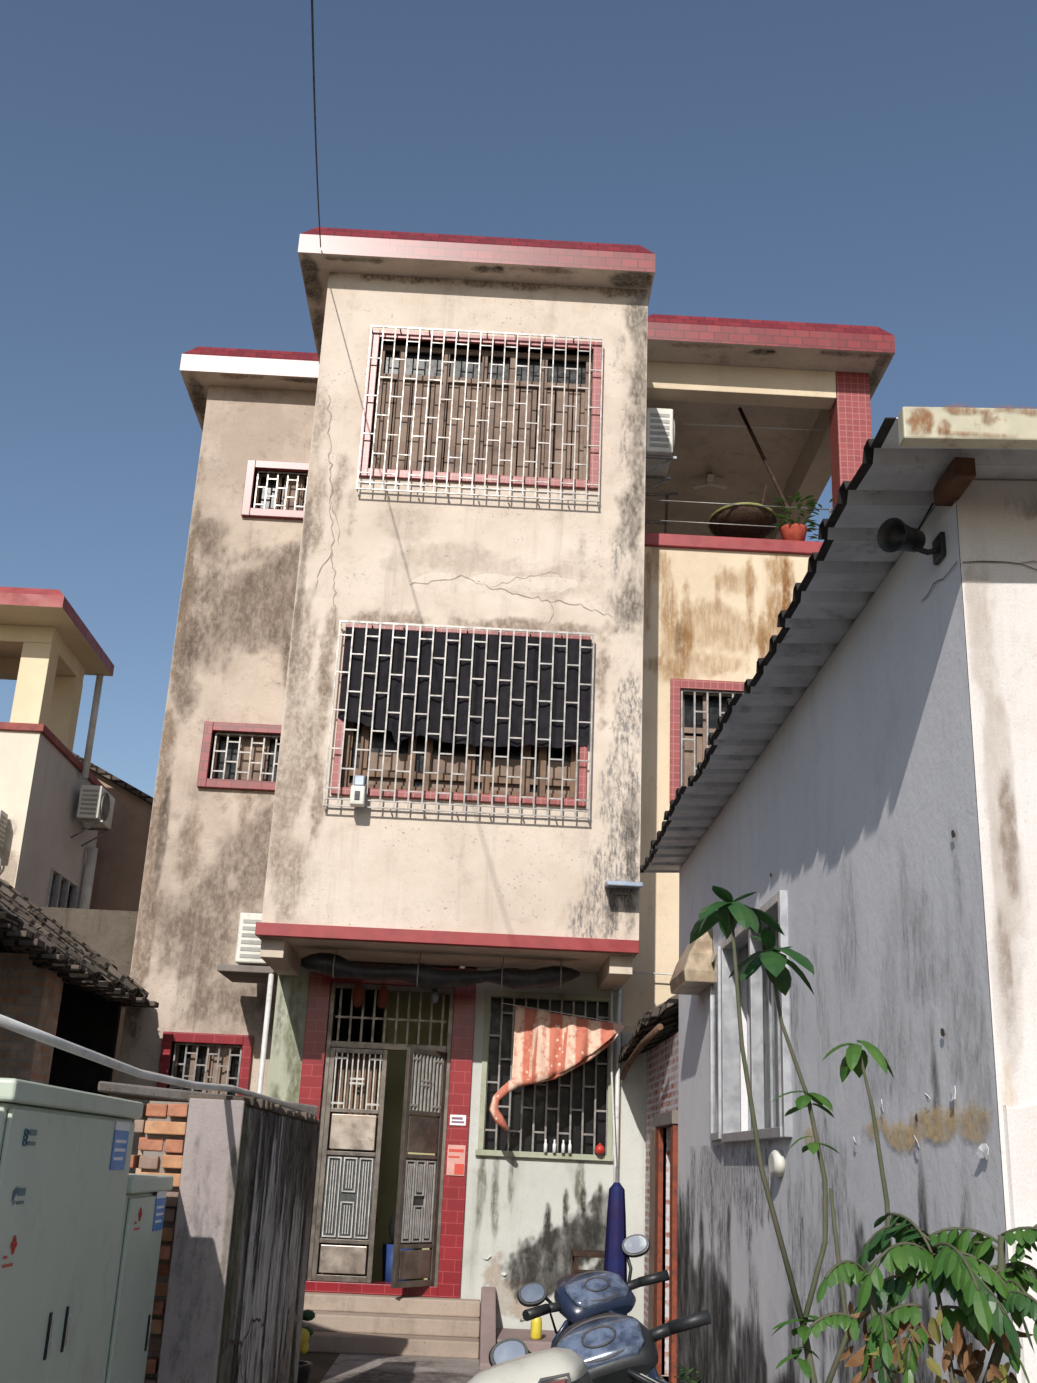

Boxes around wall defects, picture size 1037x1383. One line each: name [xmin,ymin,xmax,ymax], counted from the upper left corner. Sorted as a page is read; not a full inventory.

crack [315,395,340,633]
crack [410,571,612,622]
water stain [747,554,793,652]
crack [921,561,1037,602]
water stain [128,511,307,1038]
mould [573,680,642,938]
water stain [237,1109,320,1383]
water stain [509,1173,607,1297]
water stain [676,1144,795,1383]
water stain [823,1227,873,1383]
spalling [854,1086,1037,1300]
spalling [1018,1316,1037,1383]